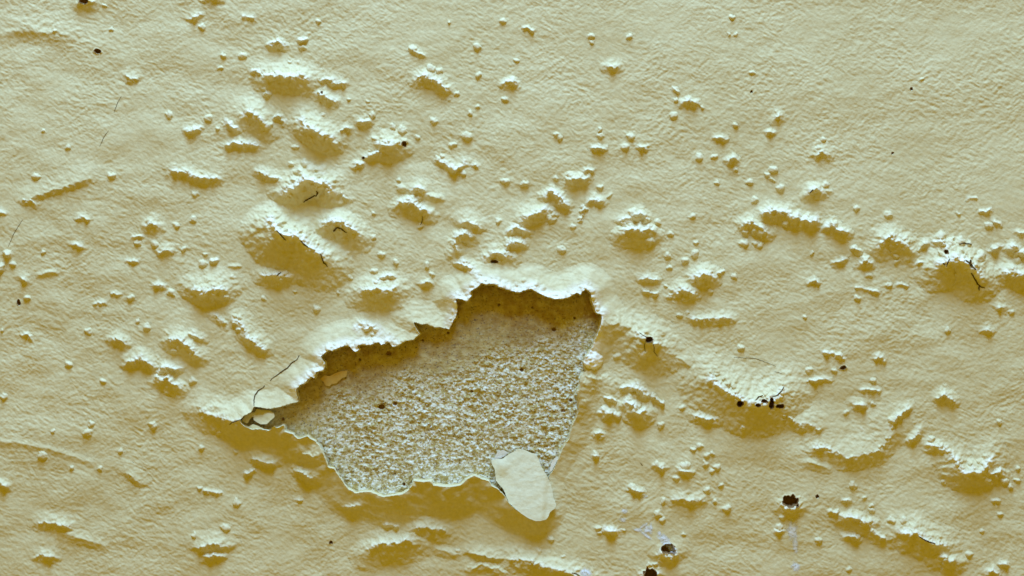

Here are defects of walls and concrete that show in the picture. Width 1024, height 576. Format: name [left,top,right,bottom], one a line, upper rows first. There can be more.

peeling [225,259,624,536]